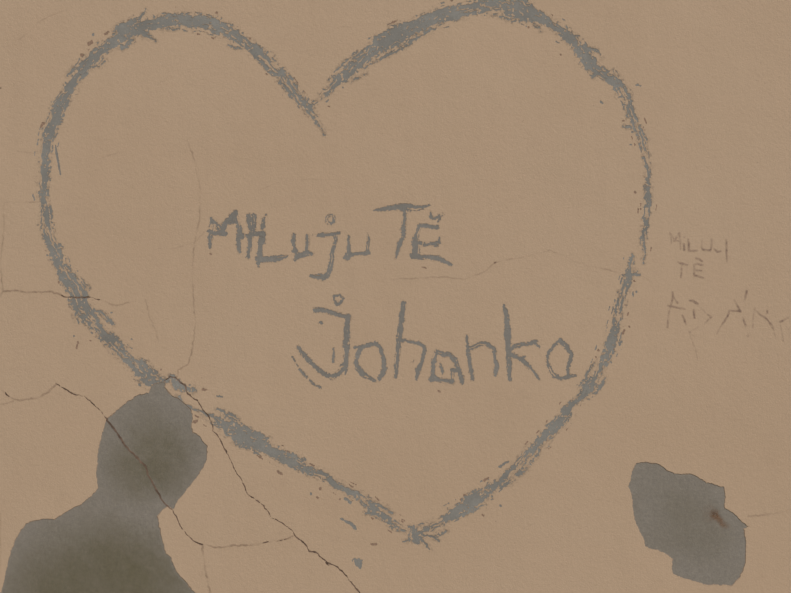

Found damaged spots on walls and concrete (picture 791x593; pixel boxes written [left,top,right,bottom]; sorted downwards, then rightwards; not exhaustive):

peeling [1,381,208,593]
crack [57,384,203,545]
crack [163,376,360,593]
peeling [628,462,748,586]